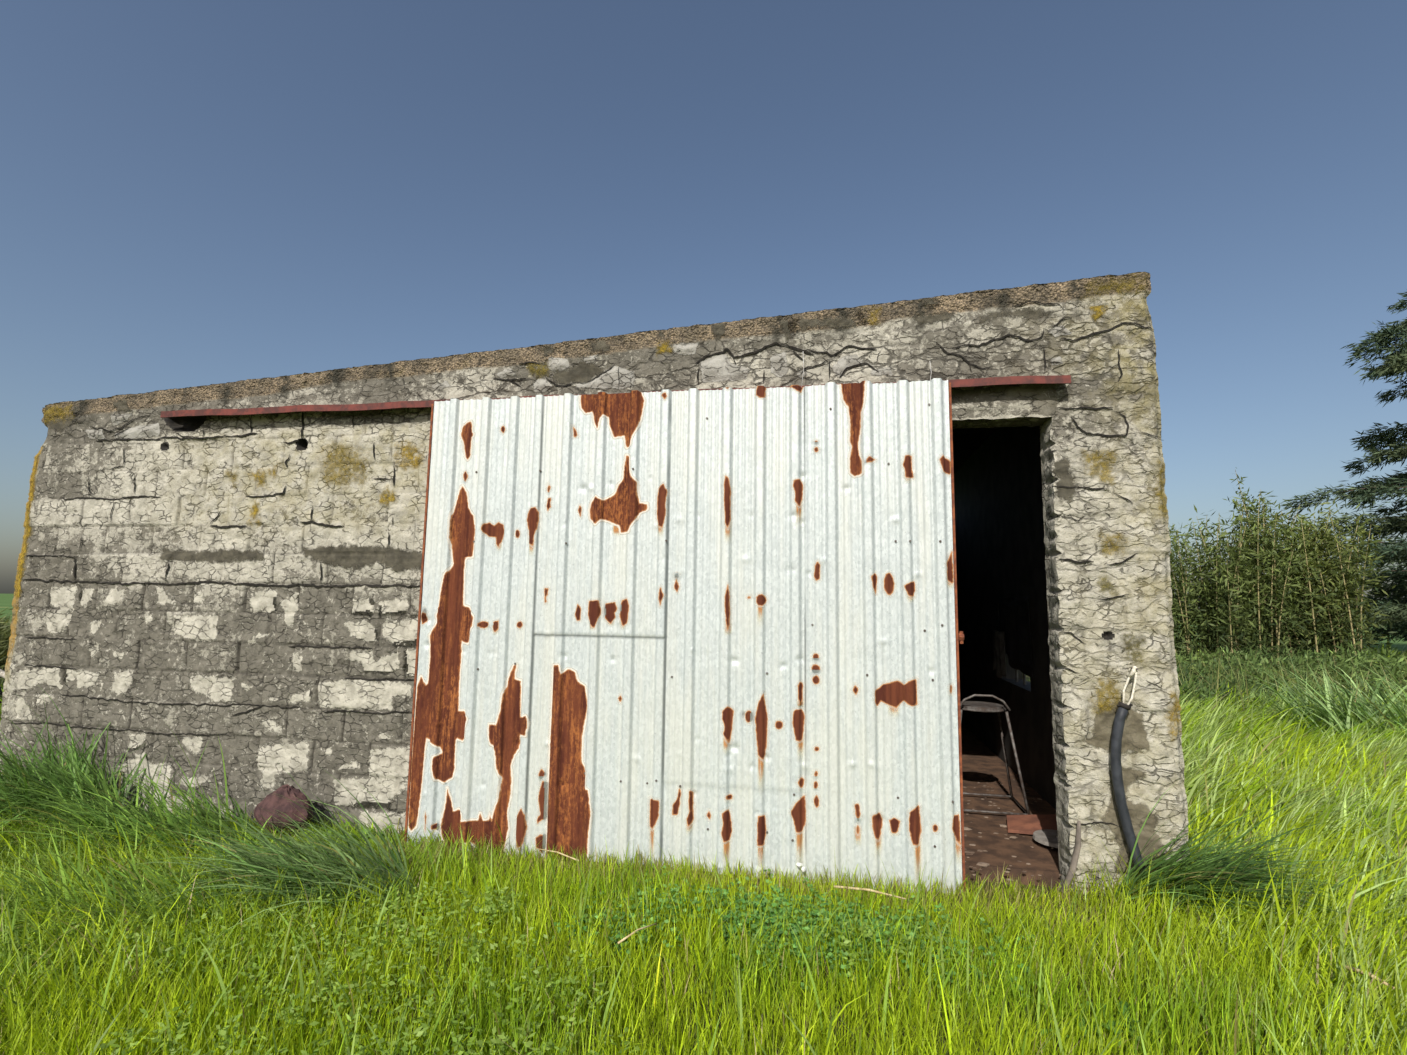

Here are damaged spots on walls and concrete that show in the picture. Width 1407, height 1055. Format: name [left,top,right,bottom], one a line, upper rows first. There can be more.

crack [695,342,879,384]
rust [578,390,668,534]
rust [839,381,876,478]
crack [940,301,1160,600]
damp [160,548,264,564]
damp [302,545,422,573]
rust [408,420,593,862]
rust [575,598,629,628]
rust [722,653,820,778]
rust [853,679,918,712]
rust [757,815,767,858]
rust [791,771,819,852]